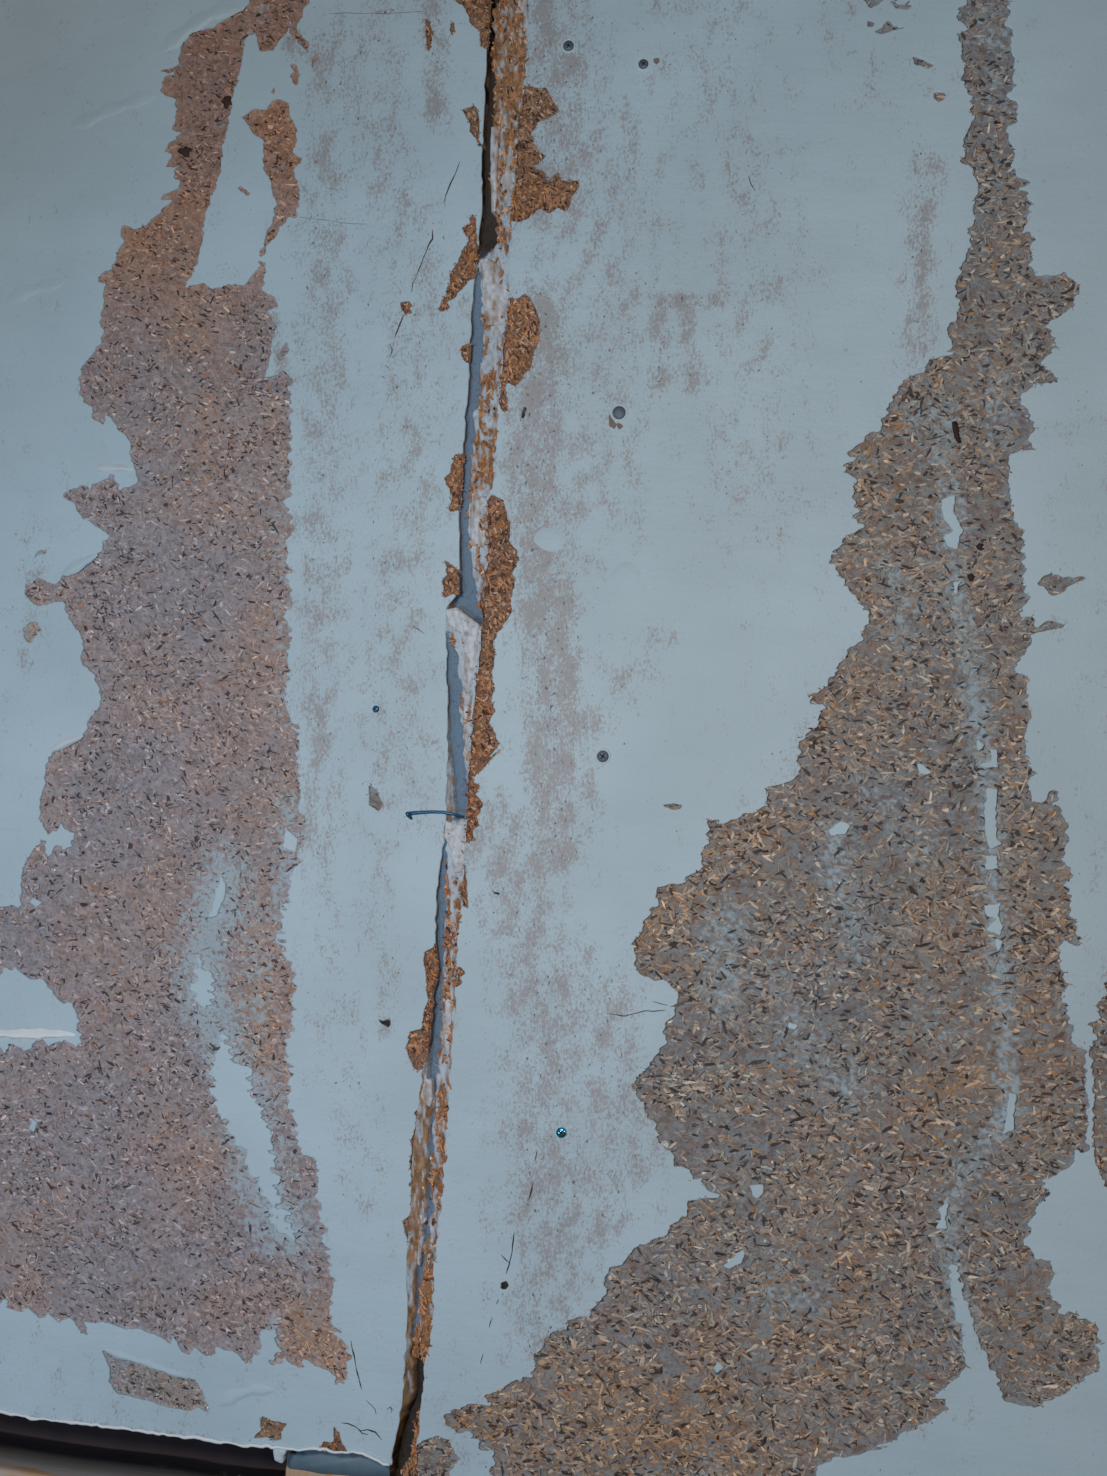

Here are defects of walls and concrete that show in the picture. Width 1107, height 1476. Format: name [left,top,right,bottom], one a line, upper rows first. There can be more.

peeling [103,1351,209,1411]
peeling [0,0,352,1384]
crack [344,0,530,1476]
peeling [402,0,1107,1476]